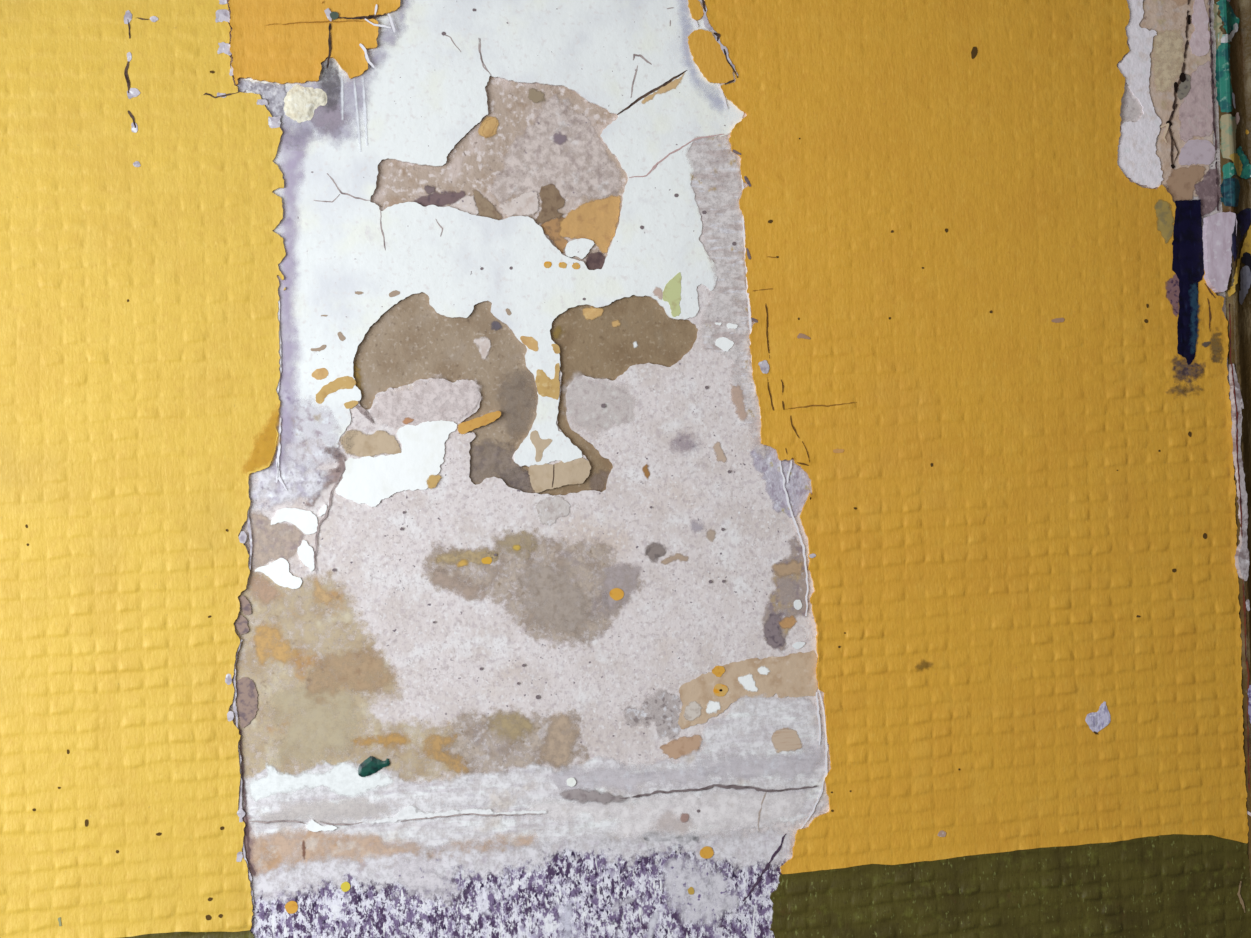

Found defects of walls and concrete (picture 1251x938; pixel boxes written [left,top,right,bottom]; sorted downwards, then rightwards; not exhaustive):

crack [617,54,687,115]
flaking render [1117,0,1251,305]
crack [1166,0,1219,211]
peeling [245,0,744,571]
flaking render [731,385,747,420]
crack [753,288,854,466]
damp [232,572,589,781]
crack [401,813,536,822]
damp [425,529,641,648]
peeling [245,666,834,861]
crack [561,784,817,831]